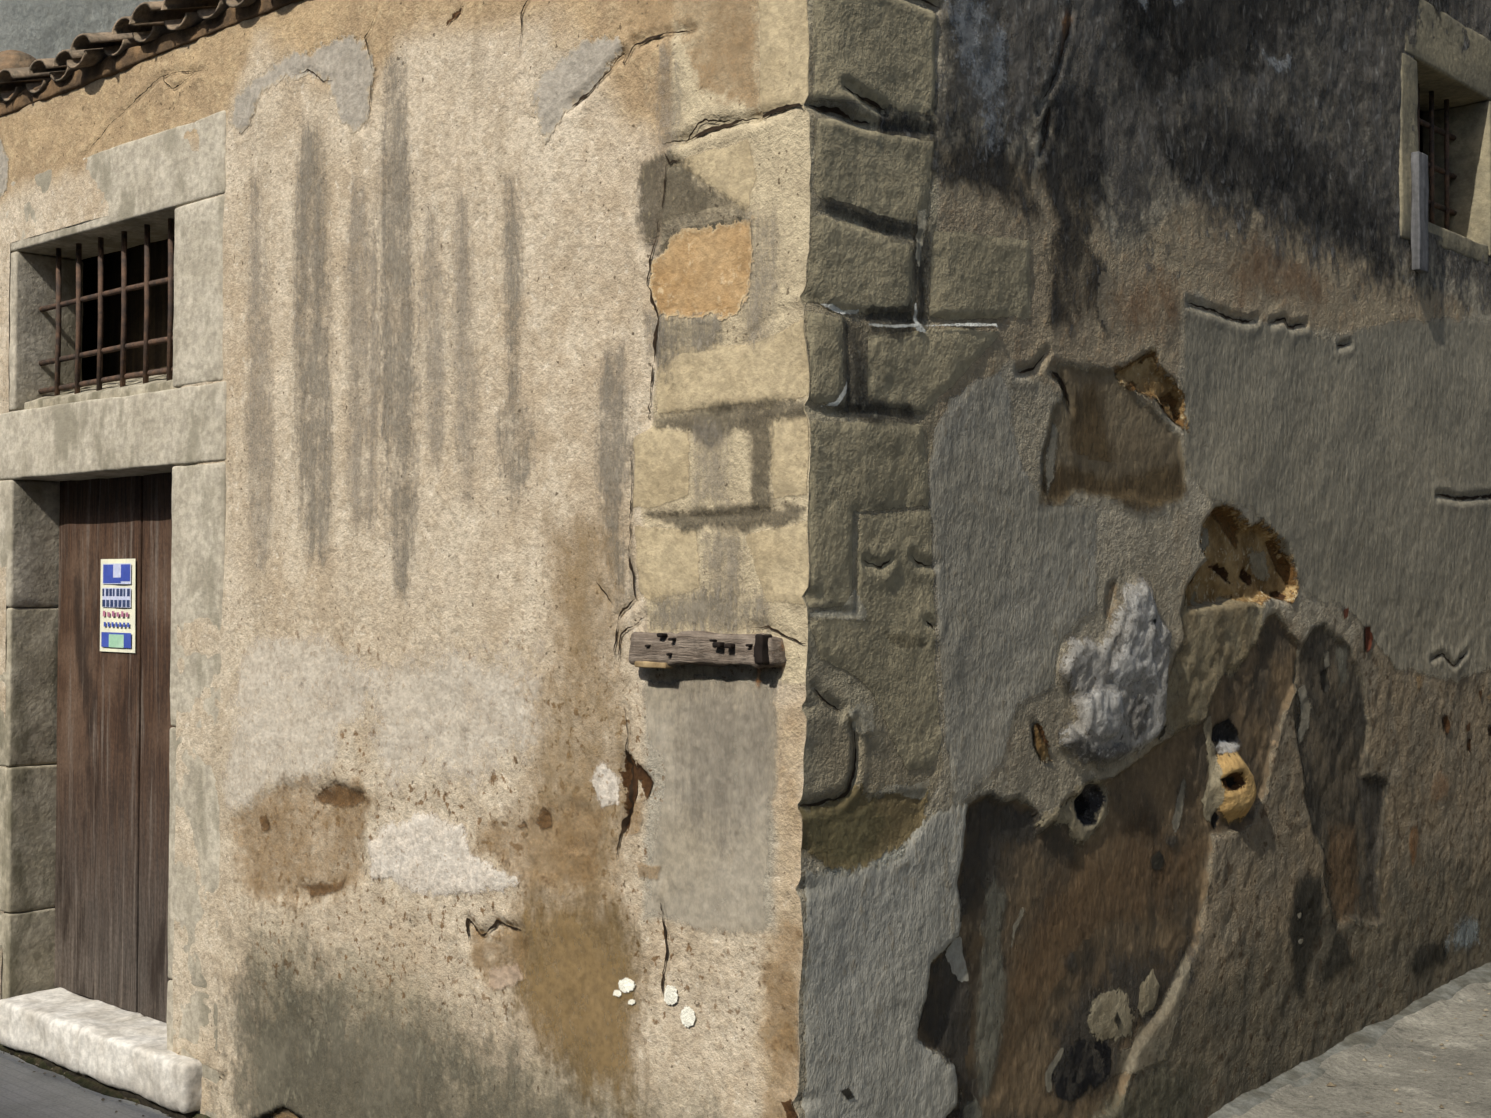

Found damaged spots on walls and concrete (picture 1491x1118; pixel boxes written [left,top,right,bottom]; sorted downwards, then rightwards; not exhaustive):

crack [572,30,693,107]
damp [878,0,1491,337]
damp [293,126,333,561]
damp [381,60,415,592]
crack [597,459,643,664]
peeling [1018,343,1190,511]
crack [1438,493,1491,501]
flaking render [222,637,653,912]
crack [616,709,635,859]
spalling [917,504,1389,1118]
damp [233,898,639,1118]
crack [660,903,668,992]